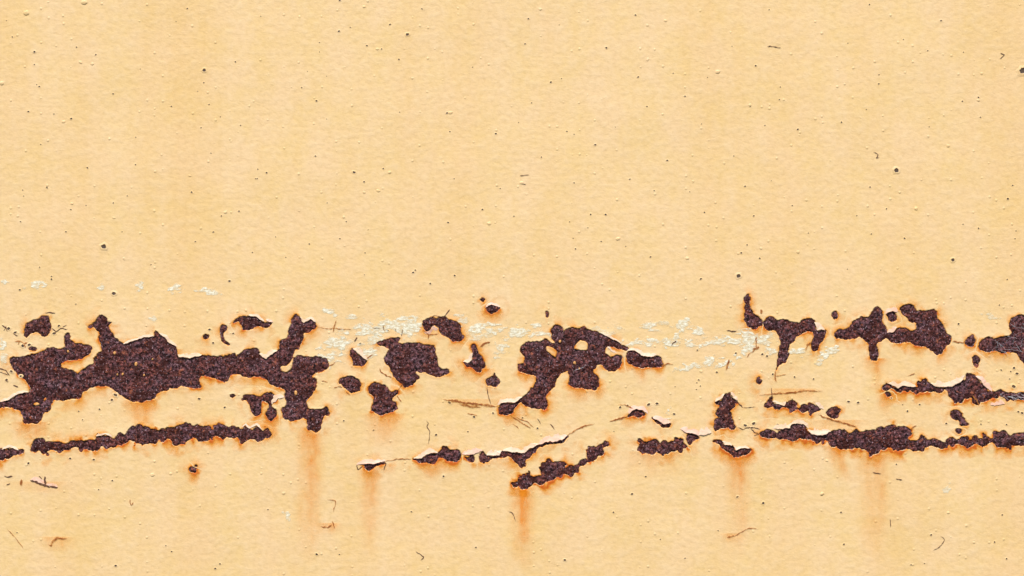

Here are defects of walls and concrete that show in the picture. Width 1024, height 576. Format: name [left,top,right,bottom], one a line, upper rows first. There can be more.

corrosion [0,313,332,467]
corrosion [339,311,664,420]
corrosion [625,293,1024,474]